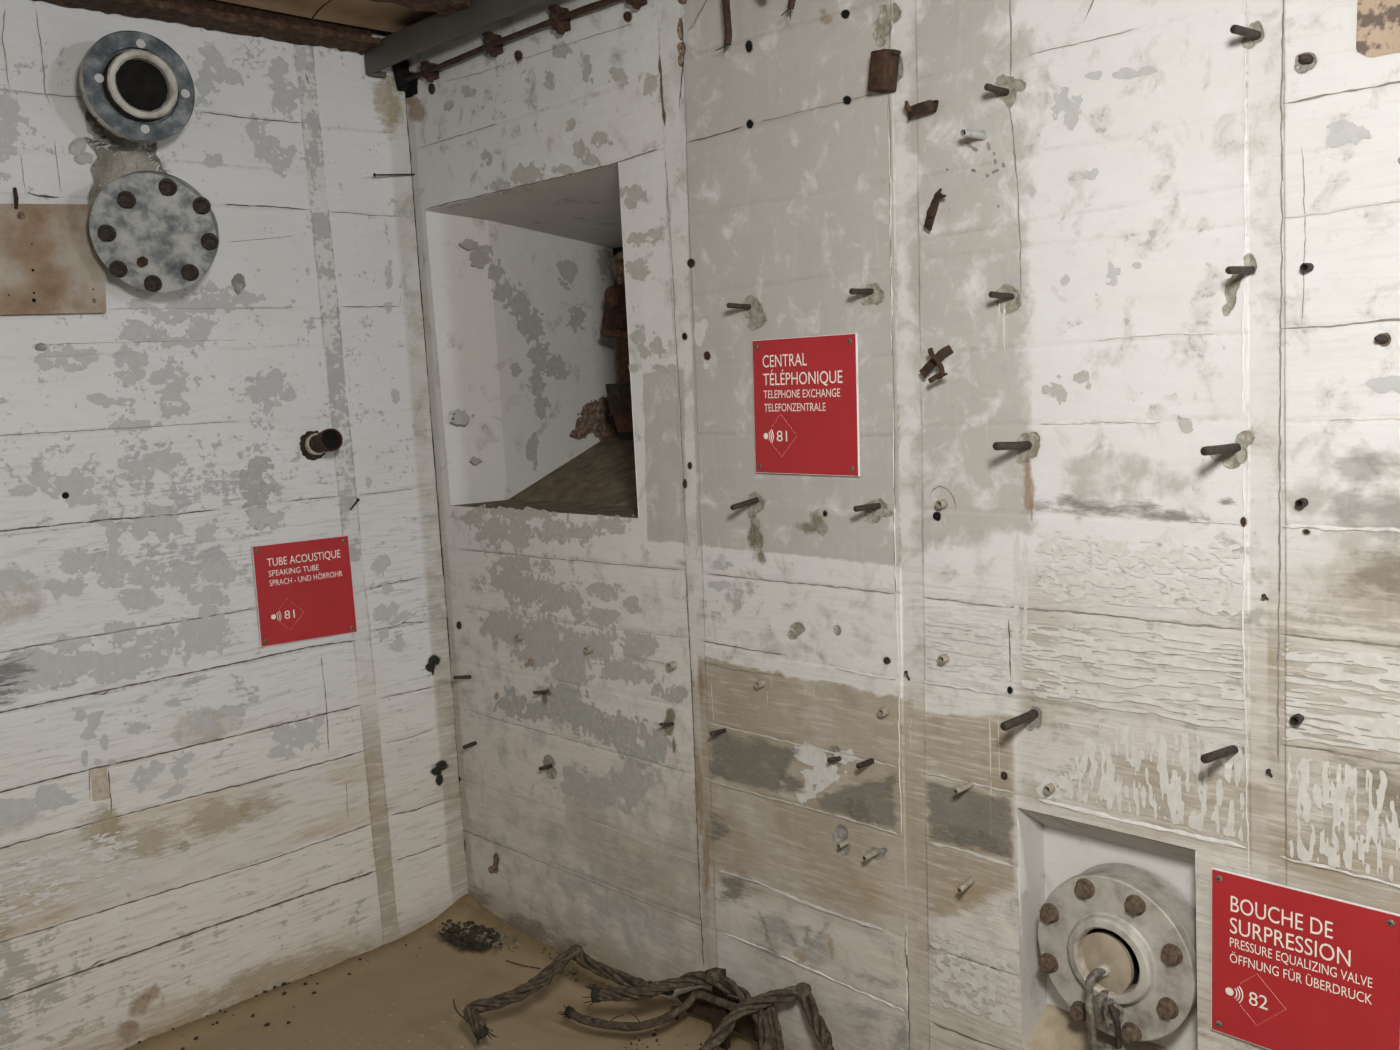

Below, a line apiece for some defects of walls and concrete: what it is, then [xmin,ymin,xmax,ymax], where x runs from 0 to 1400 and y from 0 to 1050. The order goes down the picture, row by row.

spalling [68,108,168,204]
peeling [192,44,310,180]
spalling [393,60,418,98]
rust [405,0,647,83]
peeling [34,273,266,434]
peeling [459,239,570,472]
spalling [569,397,617,441]
rust [1024,460,1034,517]
peeling [0,467,239,694]
peeling [457,504,689,815]
peeling [1052,723,1190,825]
peeling [1286,754,1319,863]